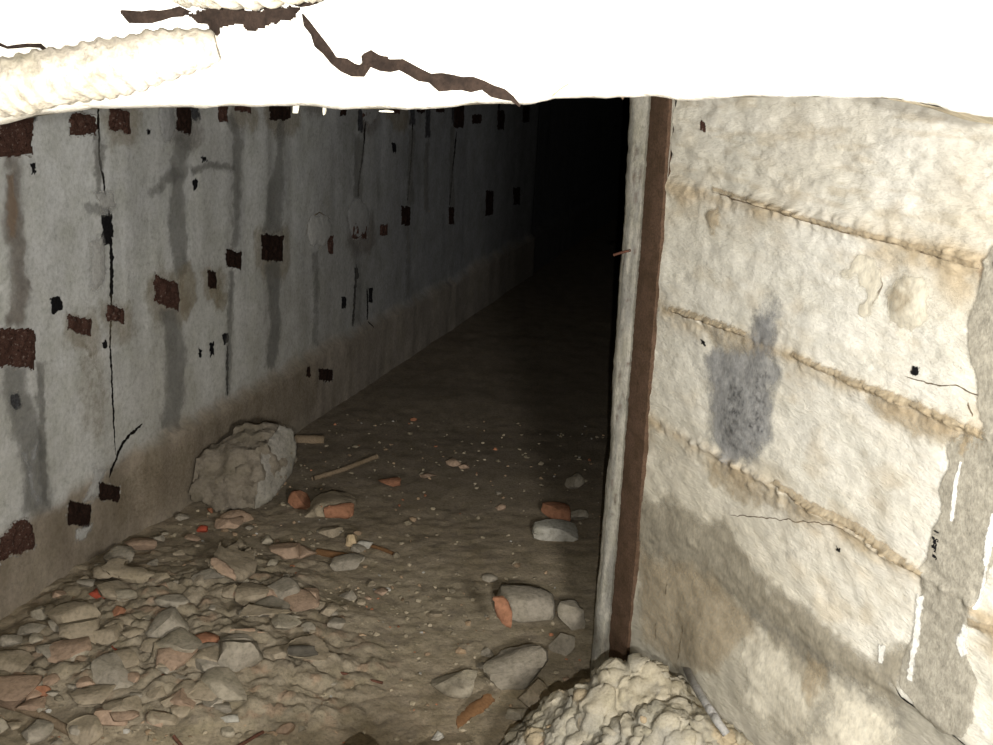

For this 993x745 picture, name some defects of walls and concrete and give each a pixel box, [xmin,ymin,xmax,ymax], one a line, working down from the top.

crack [120,0,525,111]
crack [97,109,142,478]